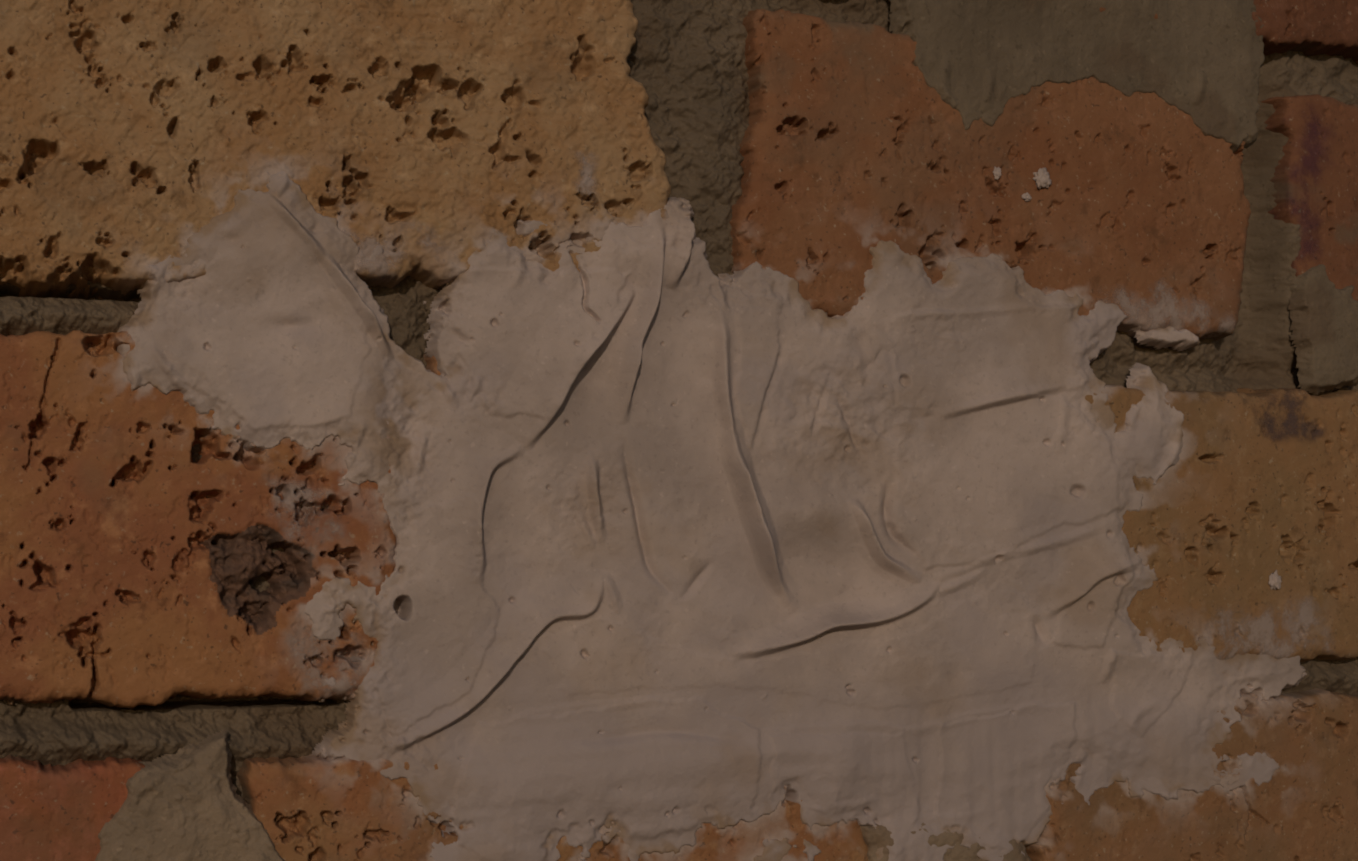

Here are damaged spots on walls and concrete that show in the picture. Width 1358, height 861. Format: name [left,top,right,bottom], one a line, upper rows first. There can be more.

peeling [514,219,548,249]
spalling [919,226,947,271]
spalling [1015,233,1049,264]
peeling [1129,326,1200,351]
spalling [109,427,372,635]